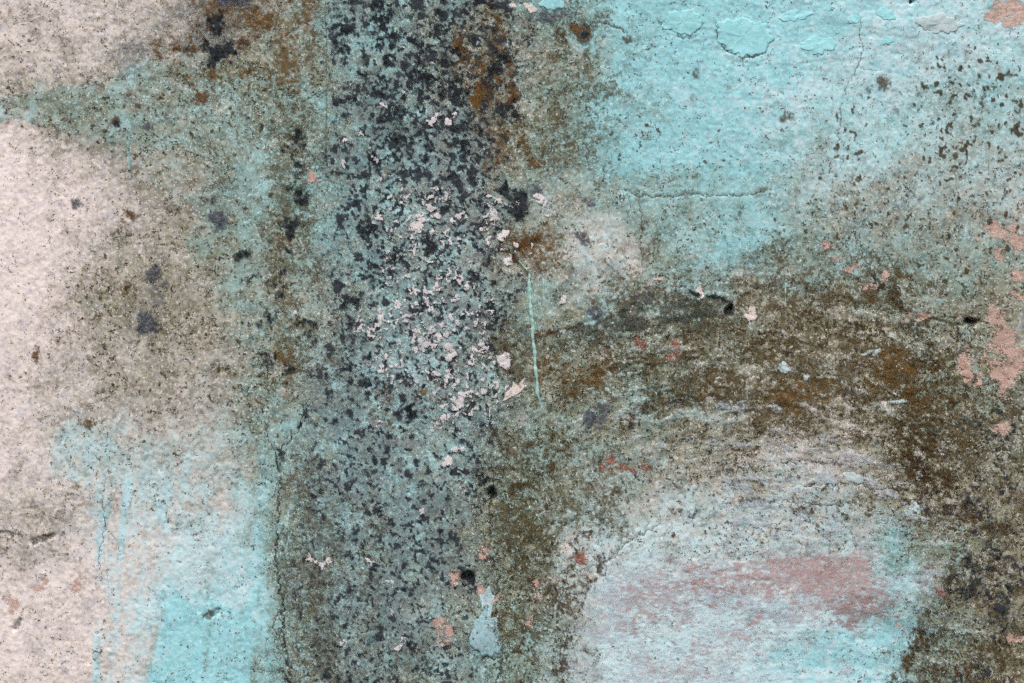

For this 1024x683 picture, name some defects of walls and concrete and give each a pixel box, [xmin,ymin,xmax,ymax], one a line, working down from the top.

peeling [915,12,964,34]
flaking render [984,0,1024,28]
rust [451,1,628,191]
flaking render [819,239,861,273]
flaking render [982,218,1024,266]
leakage [255,0,1024,683]
flaking render [901,300,1024,400]
peeling [502,378,527,402]
flaking render [990,416,1011,436]
crack [264,414,304,683]